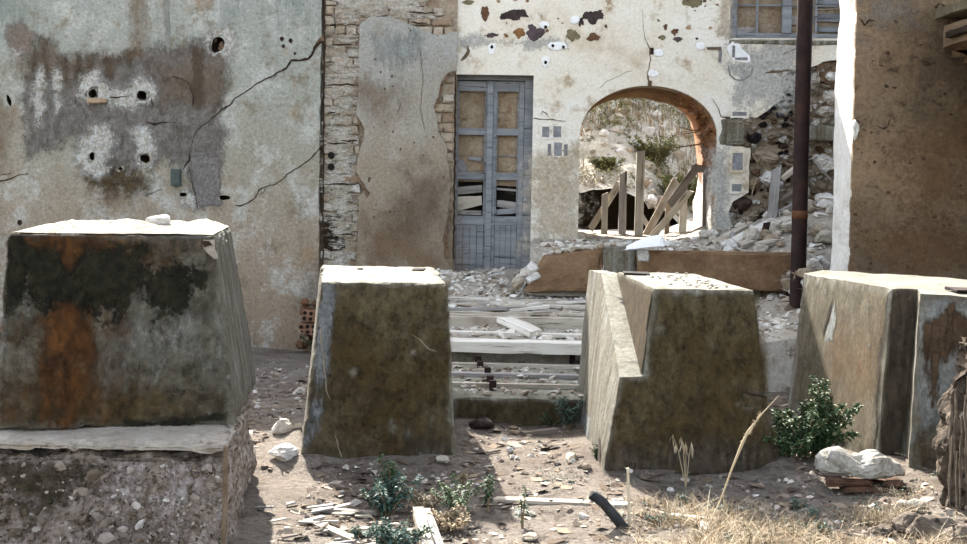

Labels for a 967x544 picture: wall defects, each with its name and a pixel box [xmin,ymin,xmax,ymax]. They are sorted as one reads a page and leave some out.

flaking render [462,0,549,42]
flaking render [557,0,611,42]
flaking render [657,19,698,42]
flaking render [682,0,719,12]
spalling [434,71,455,111]
flaking render [810,60,837,126]
water stain [5,21,230,208]
crack [109,0,326,266]
flaking render [725,71,795,228]
flaking render [808,141,834,199]
corrosion [22,233,124,273]
spalling [323,214,345,251]